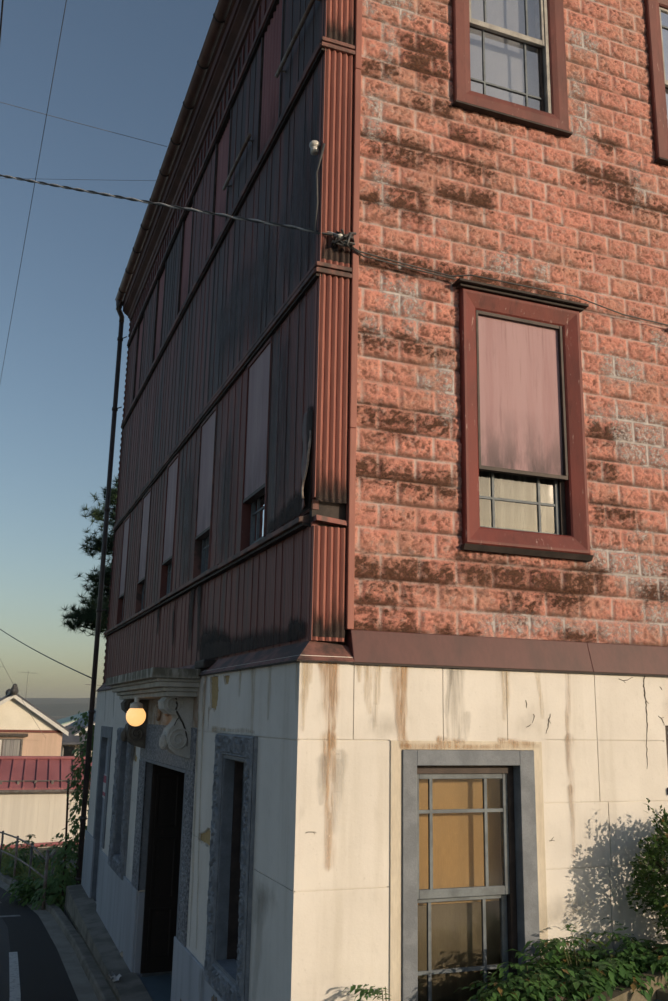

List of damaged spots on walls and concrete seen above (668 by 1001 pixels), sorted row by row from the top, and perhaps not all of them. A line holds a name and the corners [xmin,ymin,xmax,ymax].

water stain [361,55,401,81]
water stain [406,90,497,151]
water stain [368,141,422,170]
water stain [594,133,624,154]
water stain [384,184,496,225]
water stain [608,190,668,218]
water stain [354,592,415,617]
water stain [500,592,586,624]
water stain [560,628,598,642]
spalling [212,675,230,710]
crack [619,676,664,766]